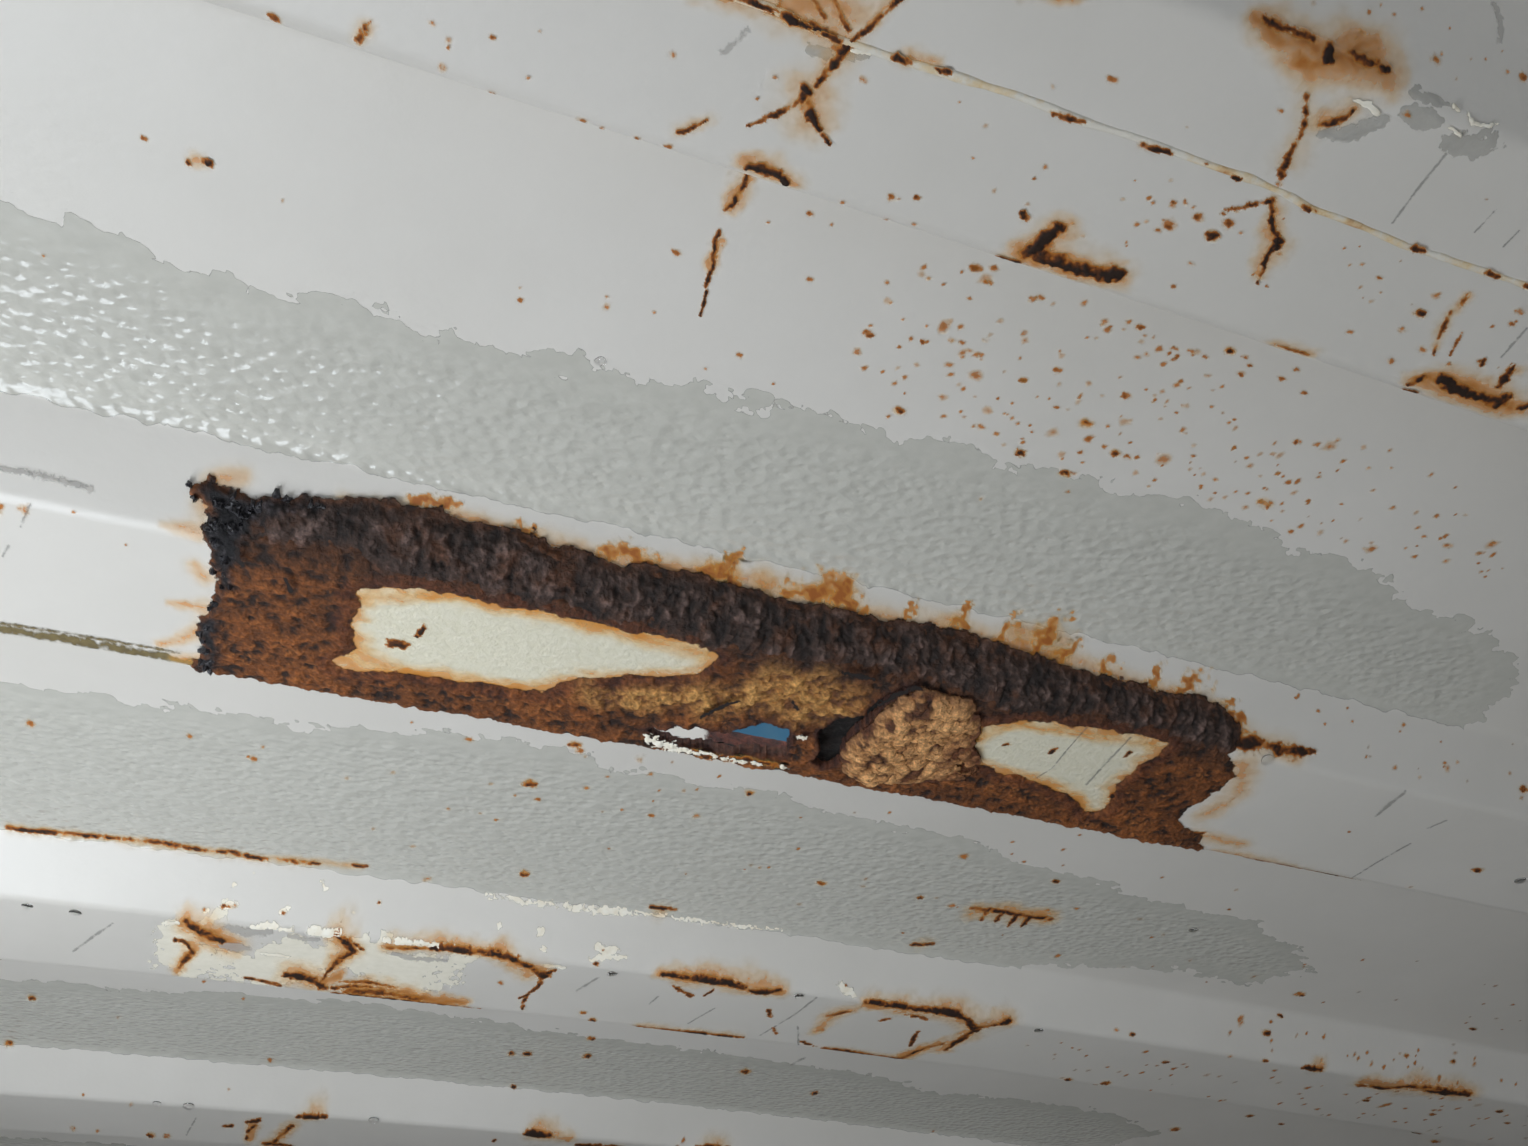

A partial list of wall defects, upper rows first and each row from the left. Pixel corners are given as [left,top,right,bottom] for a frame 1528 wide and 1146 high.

corrosion [729,0,844,45]
corrosion [890,52,913,66]
corrosion [1249,4,1396,187]
corrosion [960,210,1128,285]
corrosion [897,322,984,391]
corrosion [1403,294,1528,414]
corrosion [180,473,1316,852]
peeling [147,882,479,995]
peeling [588,942,627,966]
peeling [485,892,786,932]
corrosion [949,904,1054,936]
corrosion [1345,1049,1473,1143]